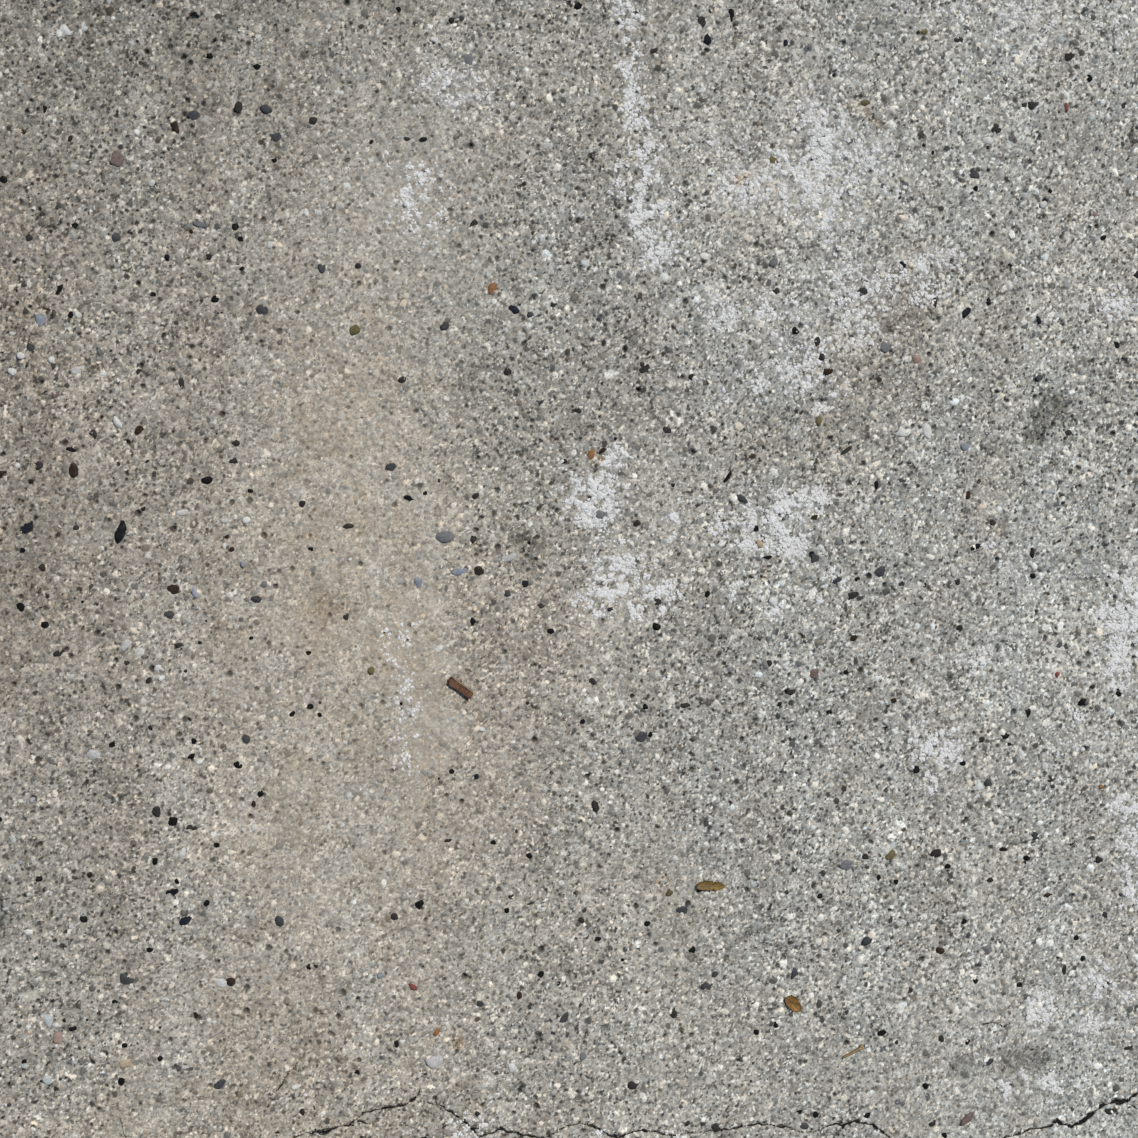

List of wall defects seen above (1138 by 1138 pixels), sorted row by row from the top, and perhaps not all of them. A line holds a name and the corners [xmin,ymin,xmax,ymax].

crack [294,1091,890,1138]
crack [1003,1093,1138,1138]